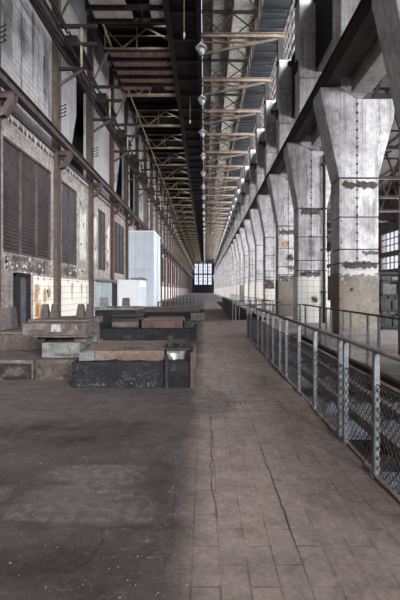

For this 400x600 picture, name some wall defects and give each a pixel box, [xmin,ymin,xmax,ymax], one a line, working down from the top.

spalling [342,180,378,190]
peeling [4,255,52,276]
spalling [341,251,378,292]
crack [207,388,217,509]
crack [261,451,295,543]